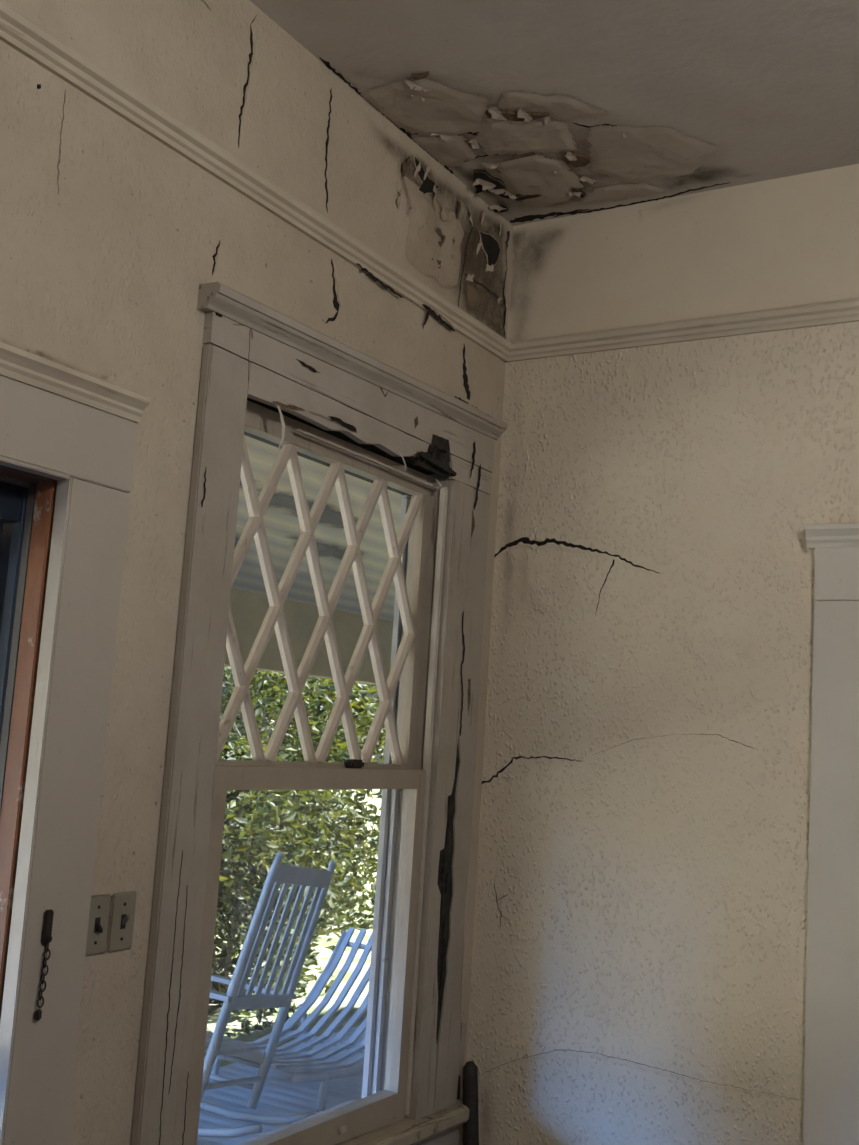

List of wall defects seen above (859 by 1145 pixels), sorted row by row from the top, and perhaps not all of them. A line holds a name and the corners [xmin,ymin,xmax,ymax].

crack [238,15,257,149]
crack [320,57,499,213]
peeling [360,71,718,272]
crack [325,259,342,324]
spalling [431,434,450,453]
crack [494,537,661,615]
crack [482,734,753,784]